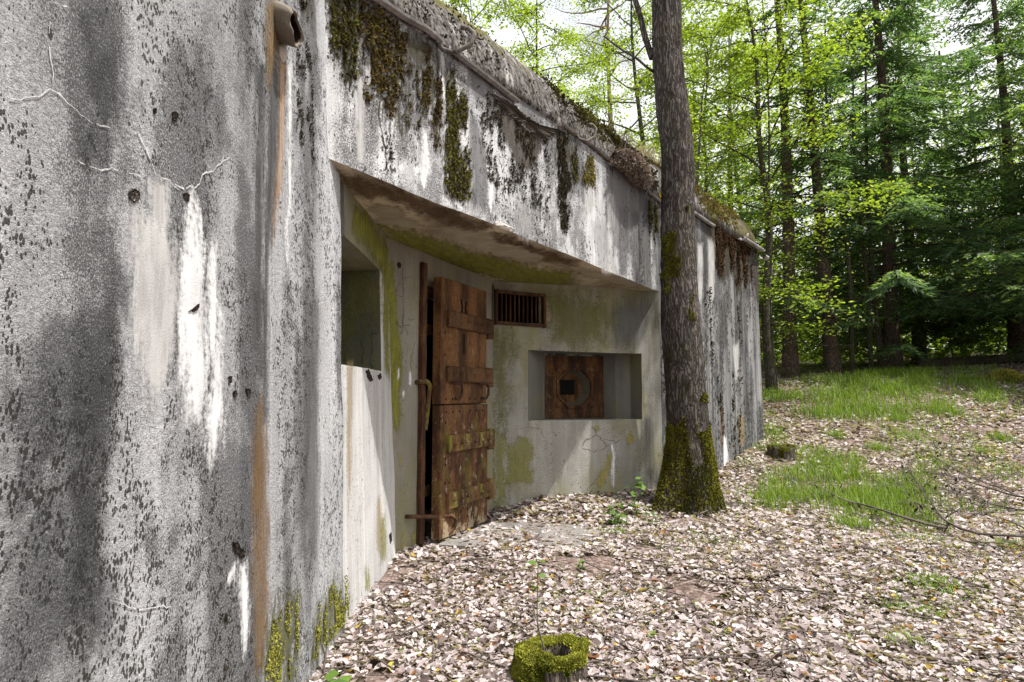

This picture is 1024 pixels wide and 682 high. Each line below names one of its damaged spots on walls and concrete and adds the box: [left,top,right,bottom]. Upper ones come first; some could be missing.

crack [10,2,110,128]
crack [78,132,230,191]
rust [264,0,286,232]
damp [355,68,372,164]
damp [399,128,432,188]
damp [439,72,449,148]
damp [494,99,542,173]
damp [619,209,640,281]
damp [697,226,760,305]
damp [0,179,226,682]
crack [582,426,621,491]
rust [250,394,271,678]